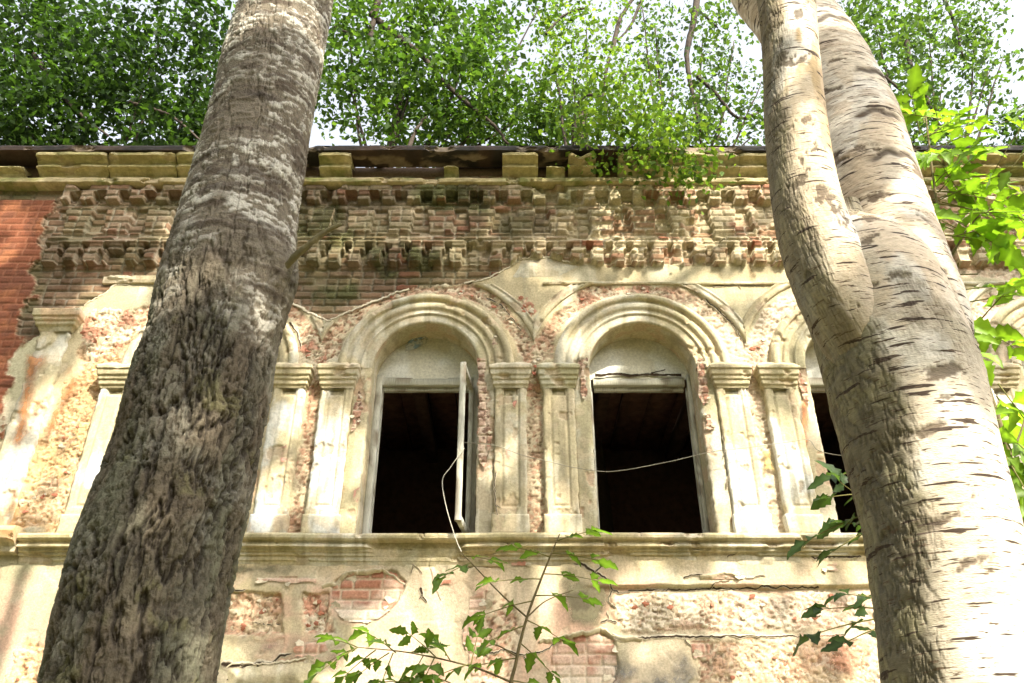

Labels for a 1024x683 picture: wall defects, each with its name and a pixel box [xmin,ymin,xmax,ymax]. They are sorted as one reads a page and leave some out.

flaking render [298,332,327,387]
flaking render [745,338,765,371]
flaking render [14,307,140,527]
flaking render [477,358,493,467]
flaking render [227,568,405,664]
flaking render [539,591,873,683]
crack [571,553,861,646]